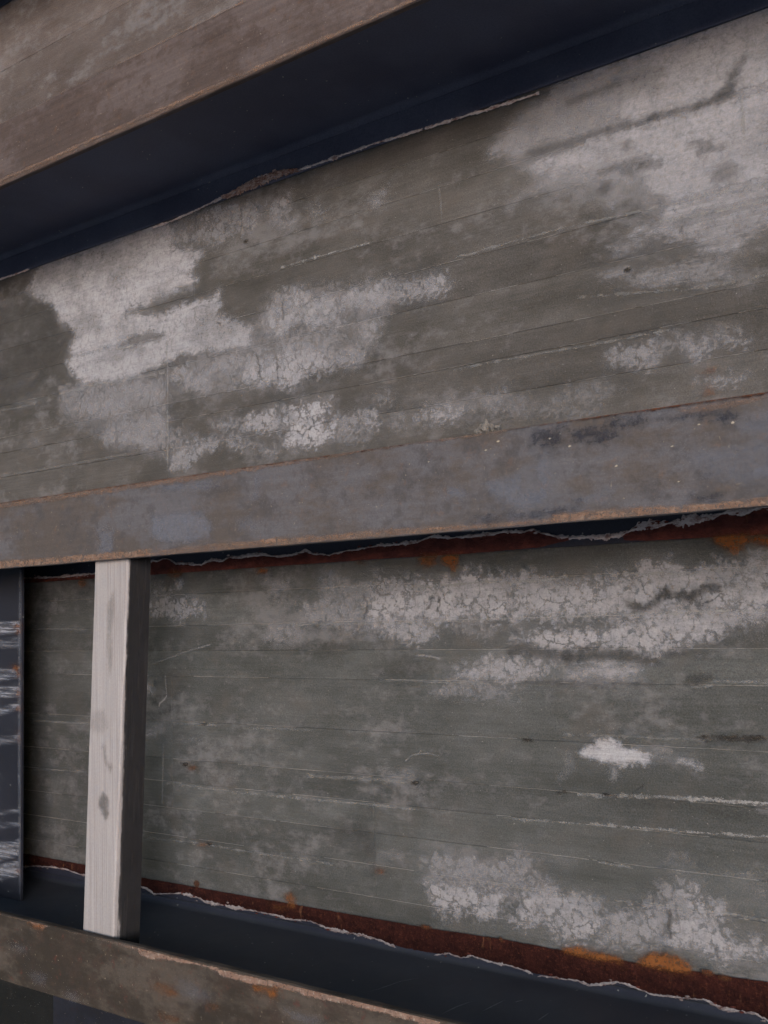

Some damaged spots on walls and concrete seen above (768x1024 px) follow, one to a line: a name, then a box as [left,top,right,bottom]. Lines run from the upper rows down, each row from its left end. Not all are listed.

peeling [250,91,539,187]
leakage [493,8,768,251]
rust [221,168,299,199]
efflorescence [30,204,390,450]
rust [0,497,768,584]
peeling [556,531,625,541]
leakage [366,557,768,683]
efflorescence [580,737,651,768]
rust [23,853,86,876]
rust [141,878,768,1022]
efflorescence [425,881,768,965]